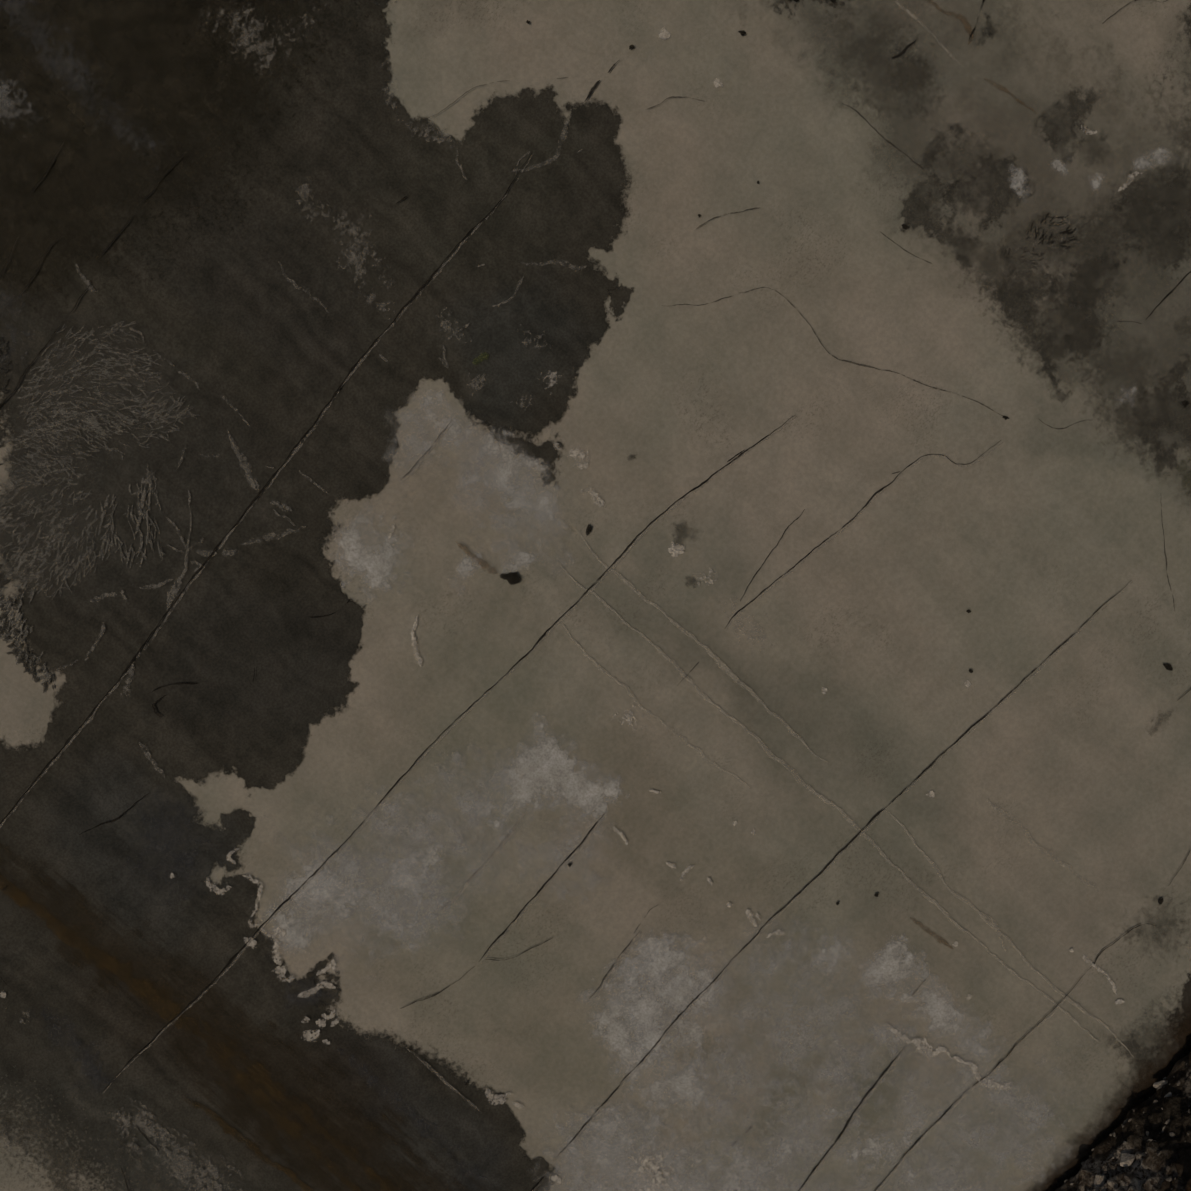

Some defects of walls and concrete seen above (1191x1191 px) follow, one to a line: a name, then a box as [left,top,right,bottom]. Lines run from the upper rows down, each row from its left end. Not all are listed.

crack [557,47,635,101]
water stain [1039,90,1105,170]
crack [0,152,532,824]
water stain [0,0,777,1191]
crack [104,415,795,1090]
crack [673,287,1003,628]
crack [531,585,1157,1191]
efflorescence [863,936,1013,1090]
water stain [901,149,1191,472]